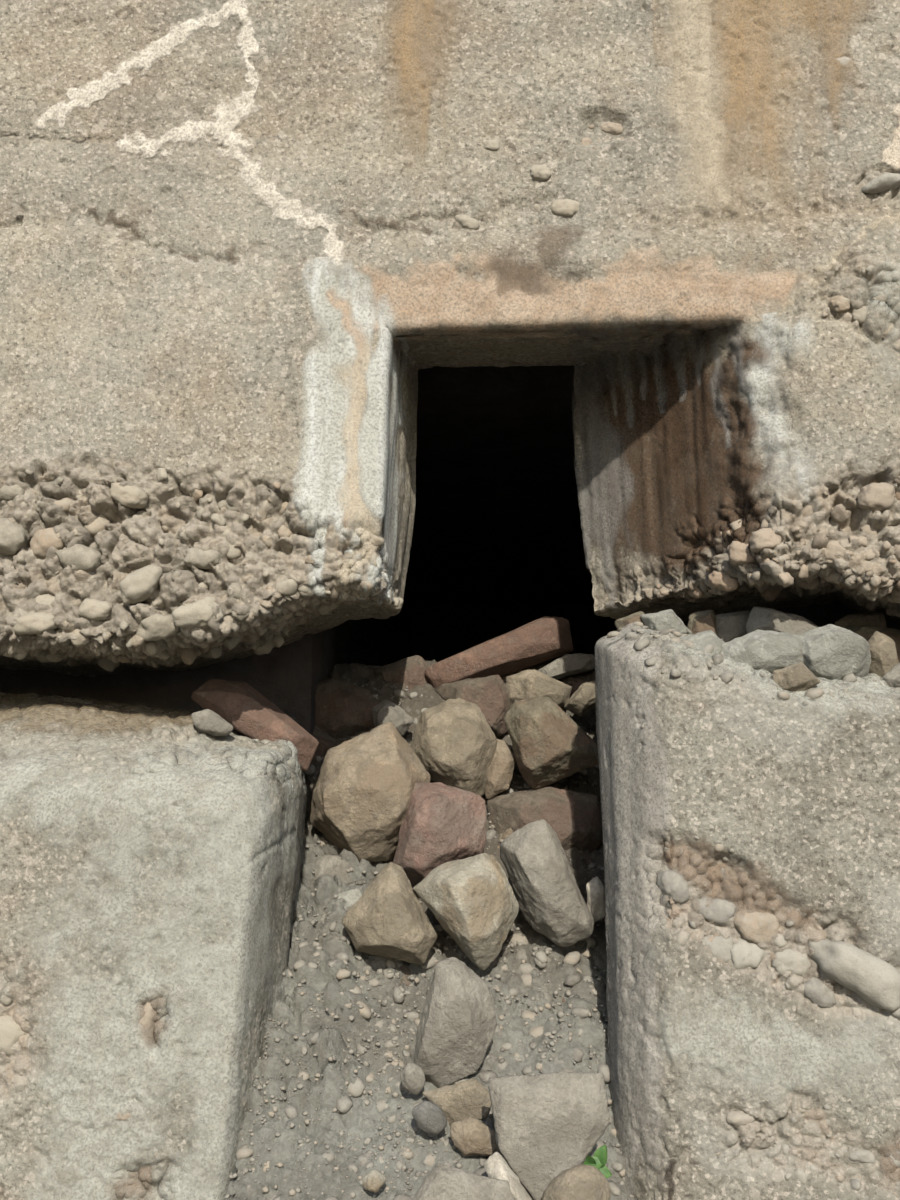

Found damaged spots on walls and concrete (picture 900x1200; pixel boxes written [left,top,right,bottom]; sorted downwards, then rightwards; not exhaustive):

crack [1,0,445,266]
spalling [861,104,900,194]
spalling [813,262,900,352]
leakage [295,257,412,605]
spalling [0,468,403,672]
spalling [645,475,900,618]
spalling [191,679,319,771]
spalling [639,831,900,1020]
spalling [0,986,27,1057]
crack [665,1160,676,1200]